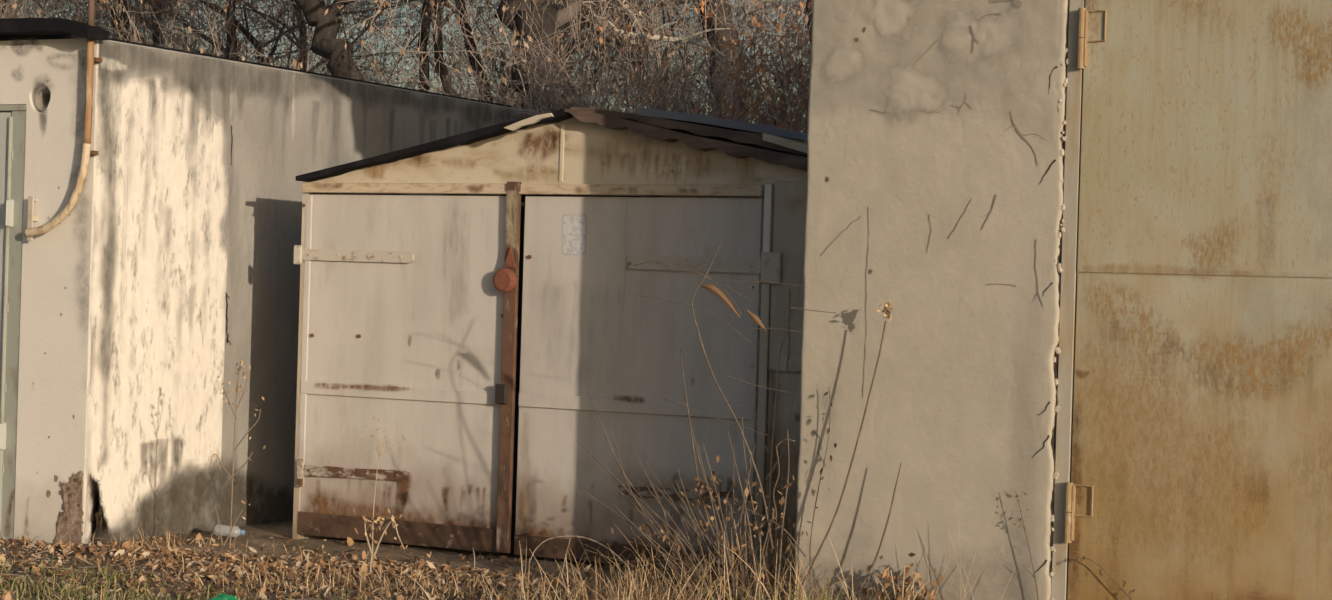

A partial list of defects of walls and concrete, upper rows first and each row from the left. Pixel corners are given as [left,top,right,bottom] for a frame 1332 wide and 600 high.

water stain [99,41,162,189]
water stain [101,214,115,377]
peeling [46,72,228,546]
rust [1090,288,1332,396]
water stain [98,464,294,544]
rust [311,479,495,529]